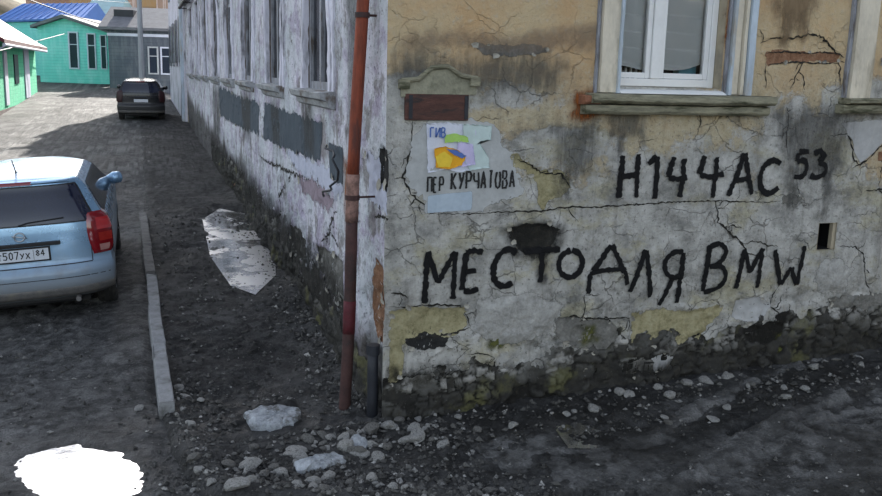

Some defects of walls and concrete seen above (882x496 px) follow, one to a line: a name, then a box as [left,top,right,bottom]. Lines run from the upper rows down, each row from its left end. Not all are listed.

damp [775,0,815,45]
flaking render [765,49,840,66]
peeling [279,146,343,213]
crack [395,121,778,255]
crack [836,133,882,193]
flaking render [841,119,882,162]
damp [211,141,343,334]
crack [840,240,876,293]
flaking render [372,258,470,387]
crack [380,283,469,330]
crack [559,294,636,359]
flaking render [554,297,771,380]